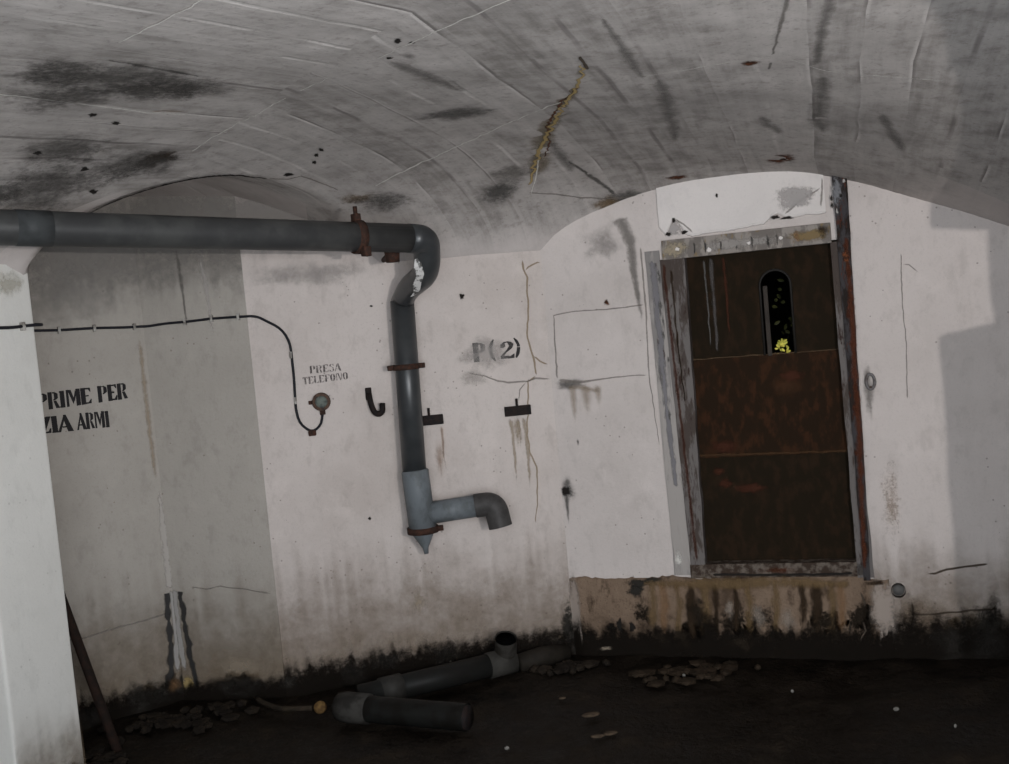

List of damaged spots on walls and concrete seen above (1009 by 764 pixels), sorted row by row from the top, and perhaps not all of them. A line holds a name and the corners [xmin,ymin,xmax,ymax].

leakage [0,139,94,210]
leakage [26,60,210,110]
leakage [102,151,176,176]
crack [376,57,633,199]
rust [790,227,827,240]
crack [471,249,659,521]
rust [663,242,697,558]
rust [693,238,867,568]
leakage [74,496,1009,732]
rust [645,568,852,637]